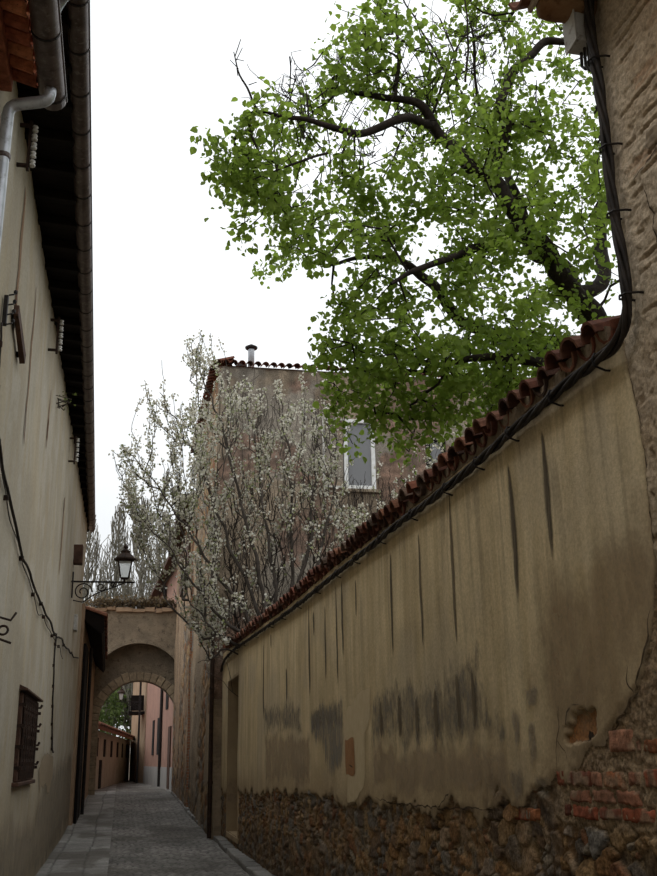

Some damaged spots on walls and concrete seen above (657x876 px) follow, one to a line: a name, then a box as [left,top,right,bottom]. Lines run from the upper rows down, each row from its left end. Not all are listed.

crack [634,148,657,242]
leakage [449,495,457,640]
leakage [507,467,518,592]
leakage [541,435,552,548]
flaking render [344,688,371,803]
leakage [373,650,536,757]
flaking render [556,769,657,824]
flaking render [608,729,657,754]